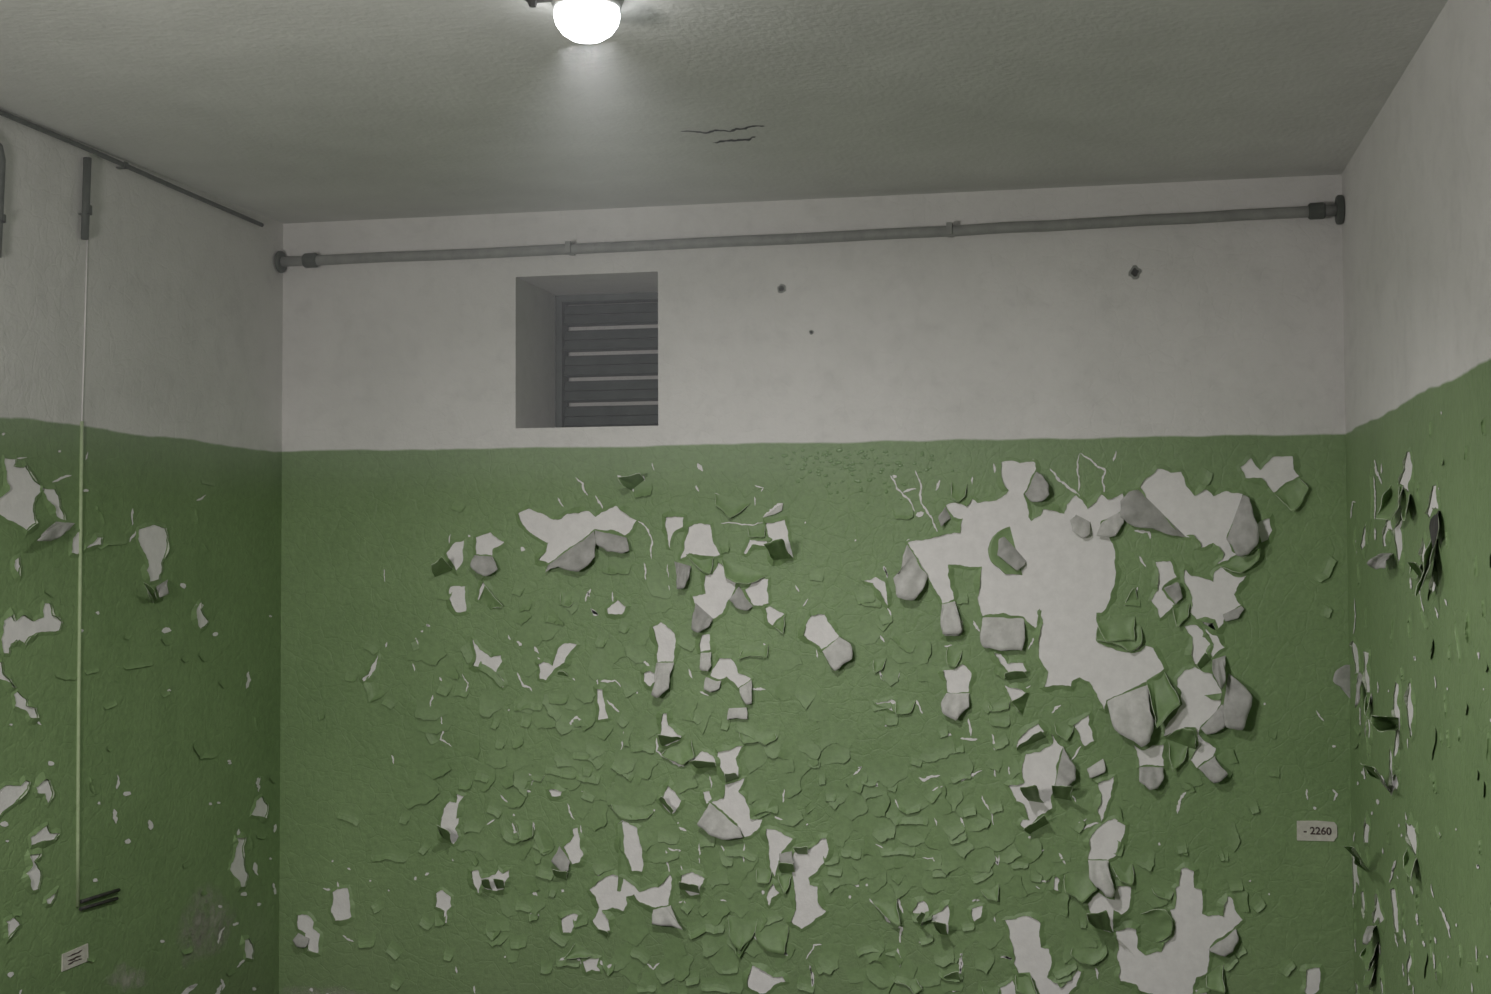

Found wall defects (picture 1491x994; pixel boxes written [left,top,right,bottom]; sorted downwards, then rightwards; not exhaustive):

peeling [0,599,63,725]
peeling [0,454,103,558]
peeling [135,521,170,603]
peeling [191,598,209,633]
peeling [404,452,1309,994]
peeling [1349,636,1416,800]
peeling [1360,447,1441,599]
peeling [2,914,22,944]
peeling [0,772,61,908]
peeling [227,793,269,892]
peeling [293,885,355,957]
peeling [1344,811,1419,994]